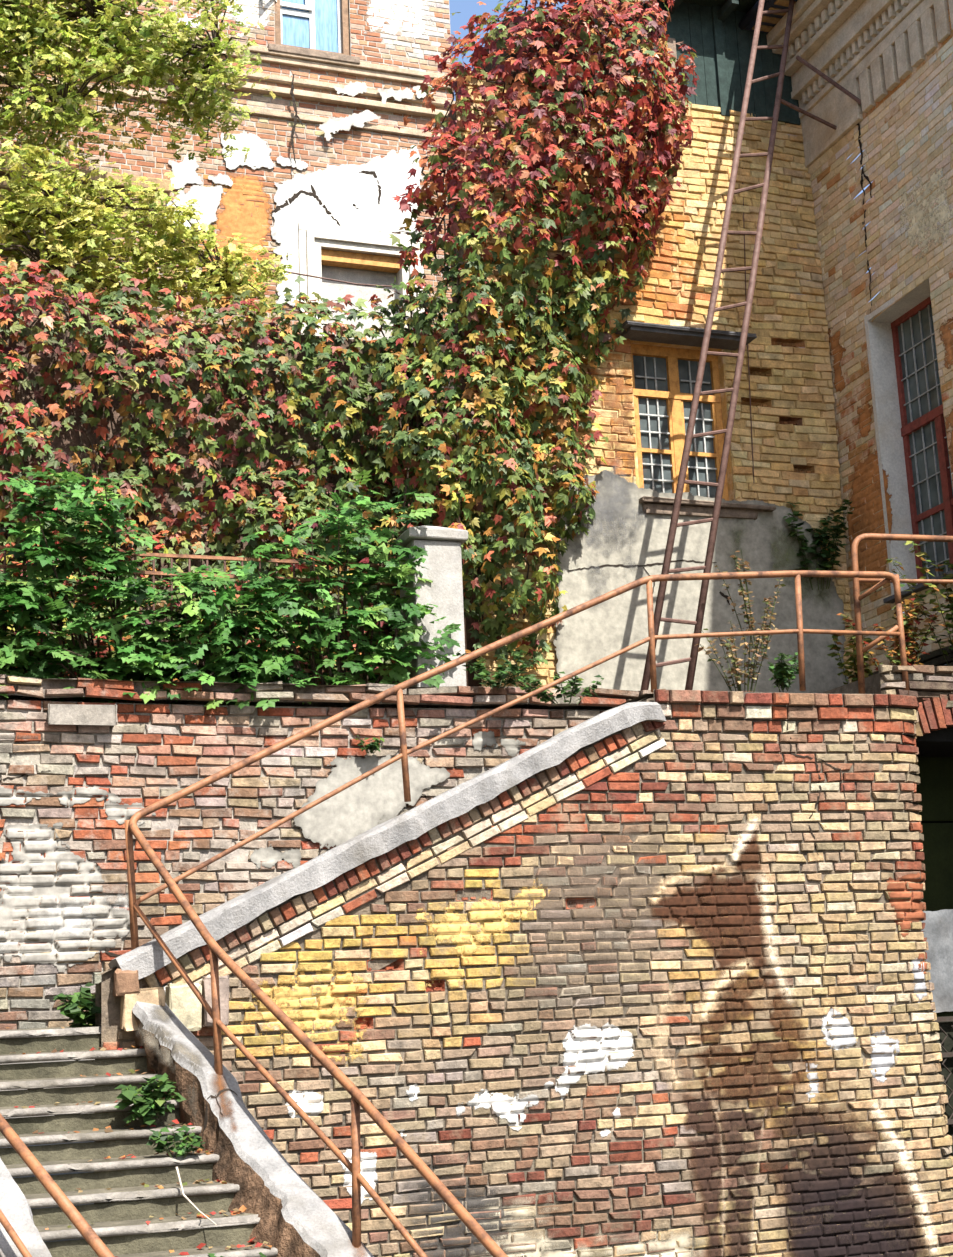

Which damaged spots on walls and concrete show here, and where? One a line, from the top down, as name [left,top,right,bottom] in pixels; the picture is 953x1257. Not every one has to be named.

peeling [176,9,205,31]
peeling [222,0,275,37]
peeling [363,0,436,40]
peeling [319,81,434,141]
crack [271,74,381,226]
peeling [166,125,423,307]
peeling [939,317,953,369]